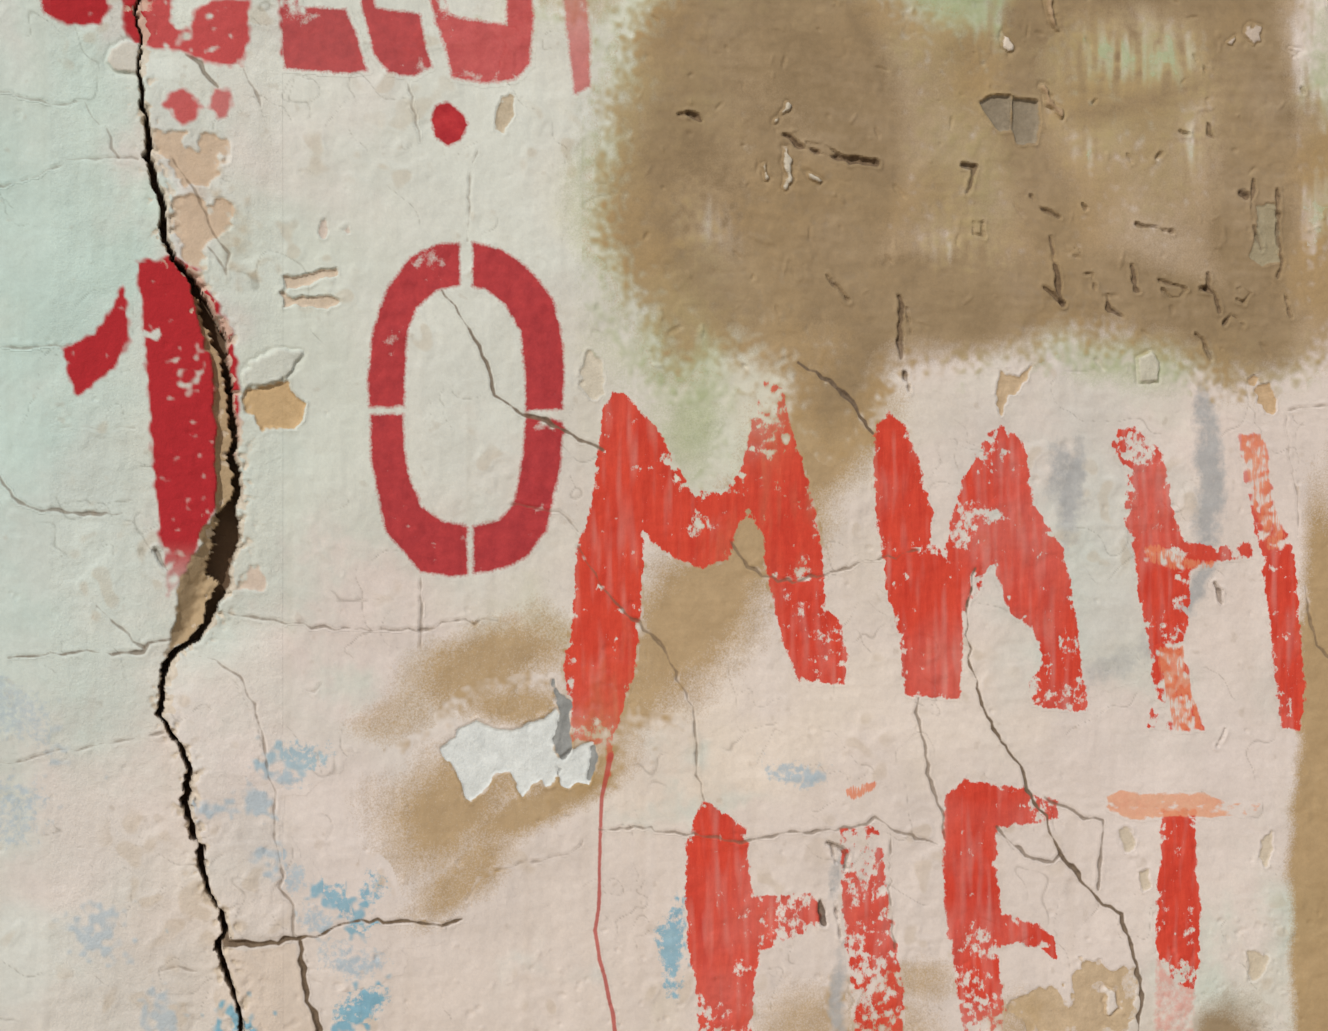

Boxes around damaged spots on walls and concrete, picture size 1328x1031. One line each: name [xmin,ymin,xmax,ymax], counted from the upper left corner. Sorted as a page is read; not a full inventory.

peeling [977,83,1065,146]
peeling [283,266,342,312]
peeling [283,347,309,432]
crack [0,0,947,1031]
peeling [438,676,601,804]
crack [963,566,1145,1031]
peeling [1005,956,1139,1031]